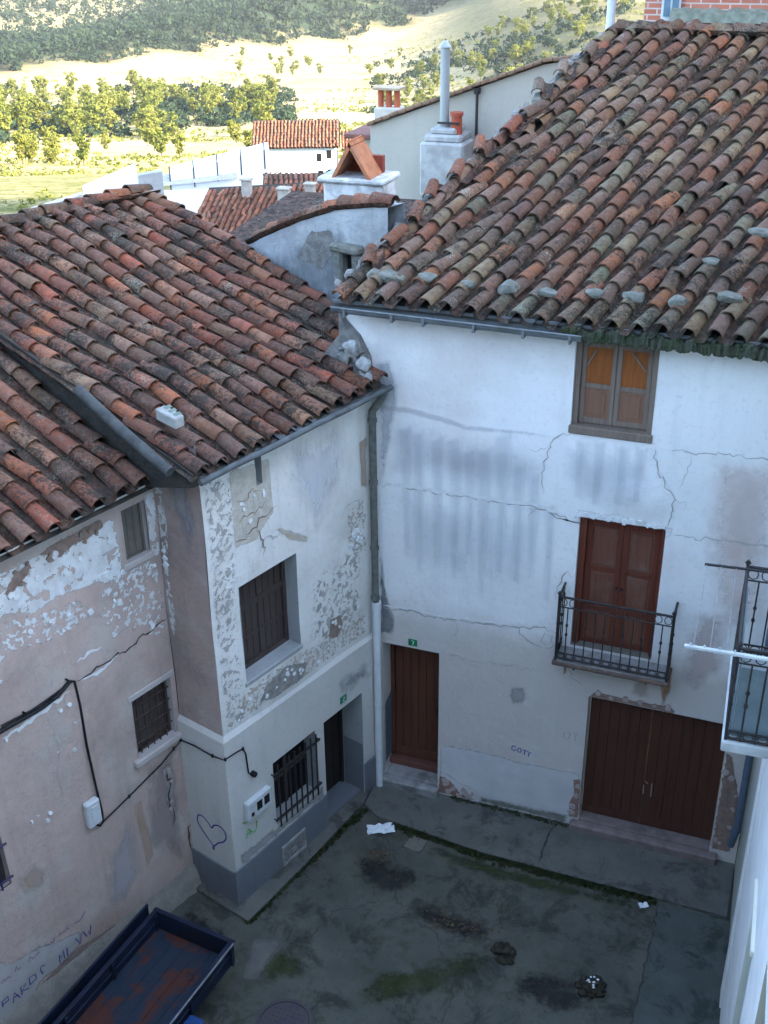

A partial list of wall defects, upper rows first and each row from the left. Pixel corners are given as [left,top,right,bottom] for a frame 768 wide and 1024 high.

crack [236,506,304,554]
crack [382,433,581,524]
crack [653,450,768,548]
peeling [0,488,176,684]
crack [76,619,166,682]
spalling [207,459,366,727]
crack [383,605,553,672]
spalling [439,772,480,801]
spalling [711,754,738,853]